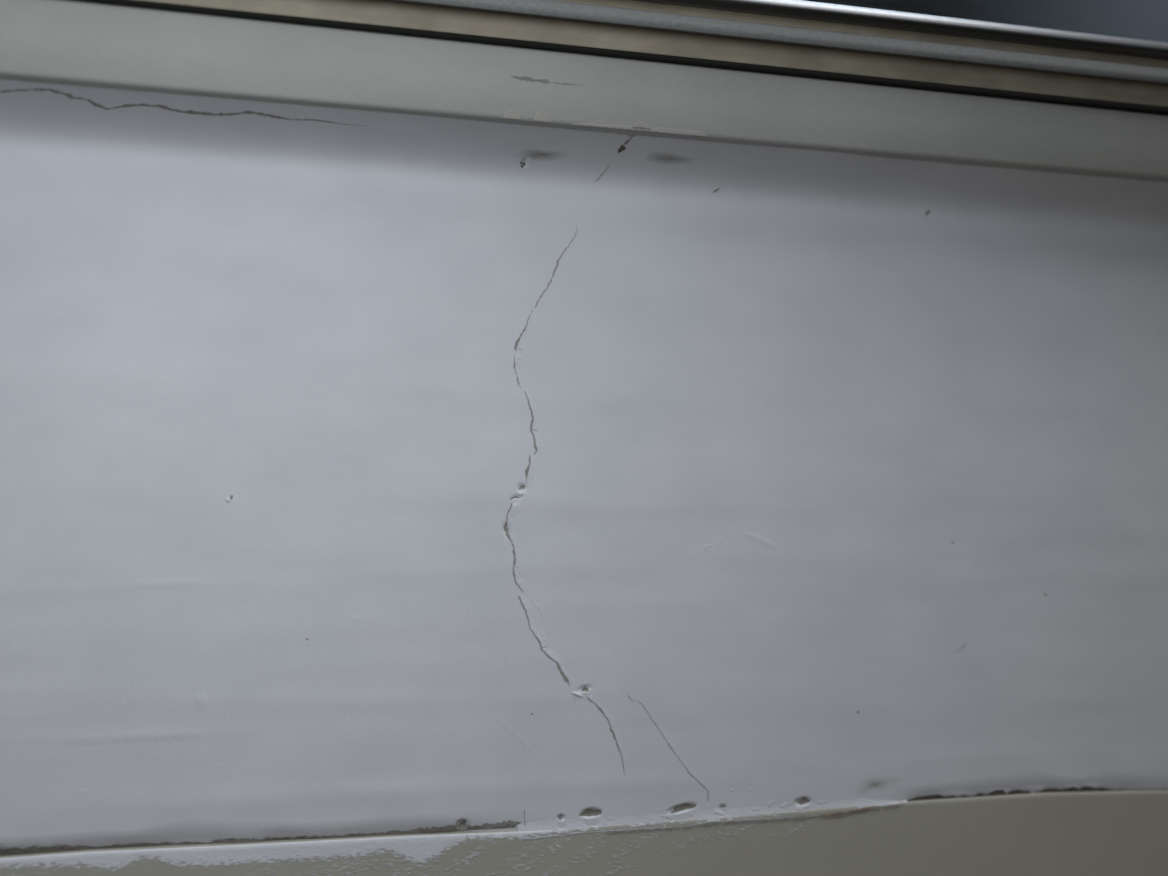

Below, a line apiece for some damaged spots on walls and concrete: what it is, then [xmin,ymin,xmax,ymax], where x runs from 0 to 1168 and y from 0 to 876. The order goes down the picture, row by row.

crack [504,225,905,834]
spalling [796,797,810,809]
hole [579,809,602,821]
hole [670,804,697,816]